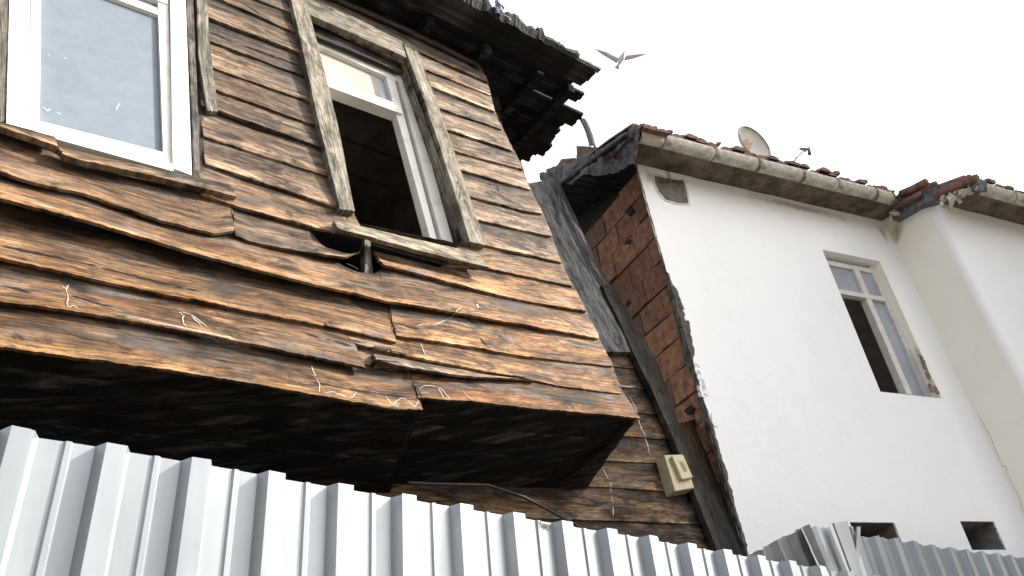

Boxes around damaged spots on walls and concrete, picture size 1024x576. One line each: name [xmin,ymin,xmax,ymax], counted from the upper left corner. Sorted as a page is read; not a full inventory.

crack [269,284,423,401]
spalling [635,164,748,557]